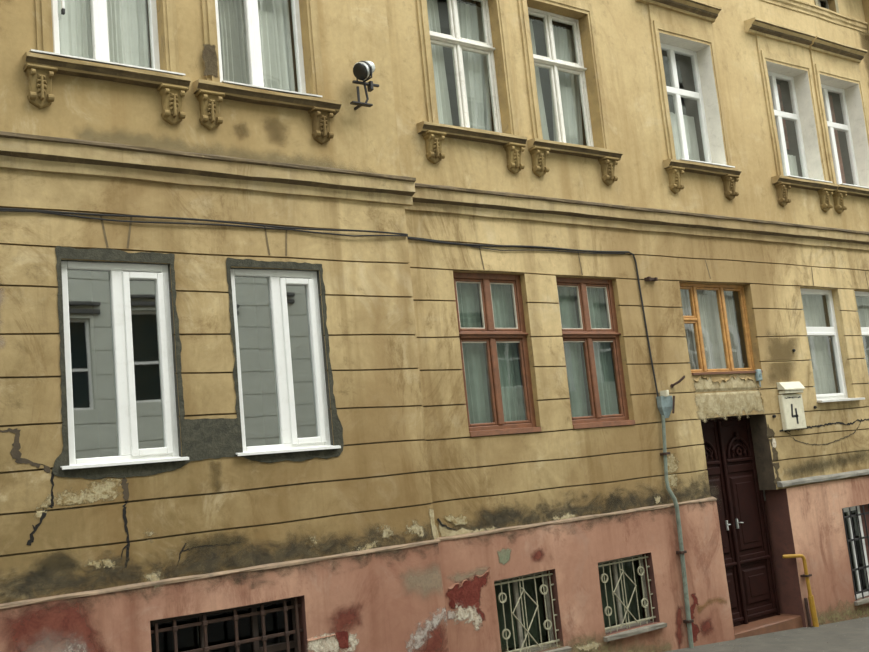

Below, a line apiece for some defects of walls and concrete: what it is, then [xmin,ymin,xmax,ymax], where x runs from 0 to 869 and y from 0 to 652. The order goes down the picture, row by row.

flaking render [694,375,764,421]
crack [0,428,54,546]
crack [121,478,130,568]
flaking render [429,509,474,540]
damp [457,481,716,538]
damp [0,520,442,603]
peeling [6,598,105,652]
flaking render [307,608,360,652]
peeling [446,568,490,630]